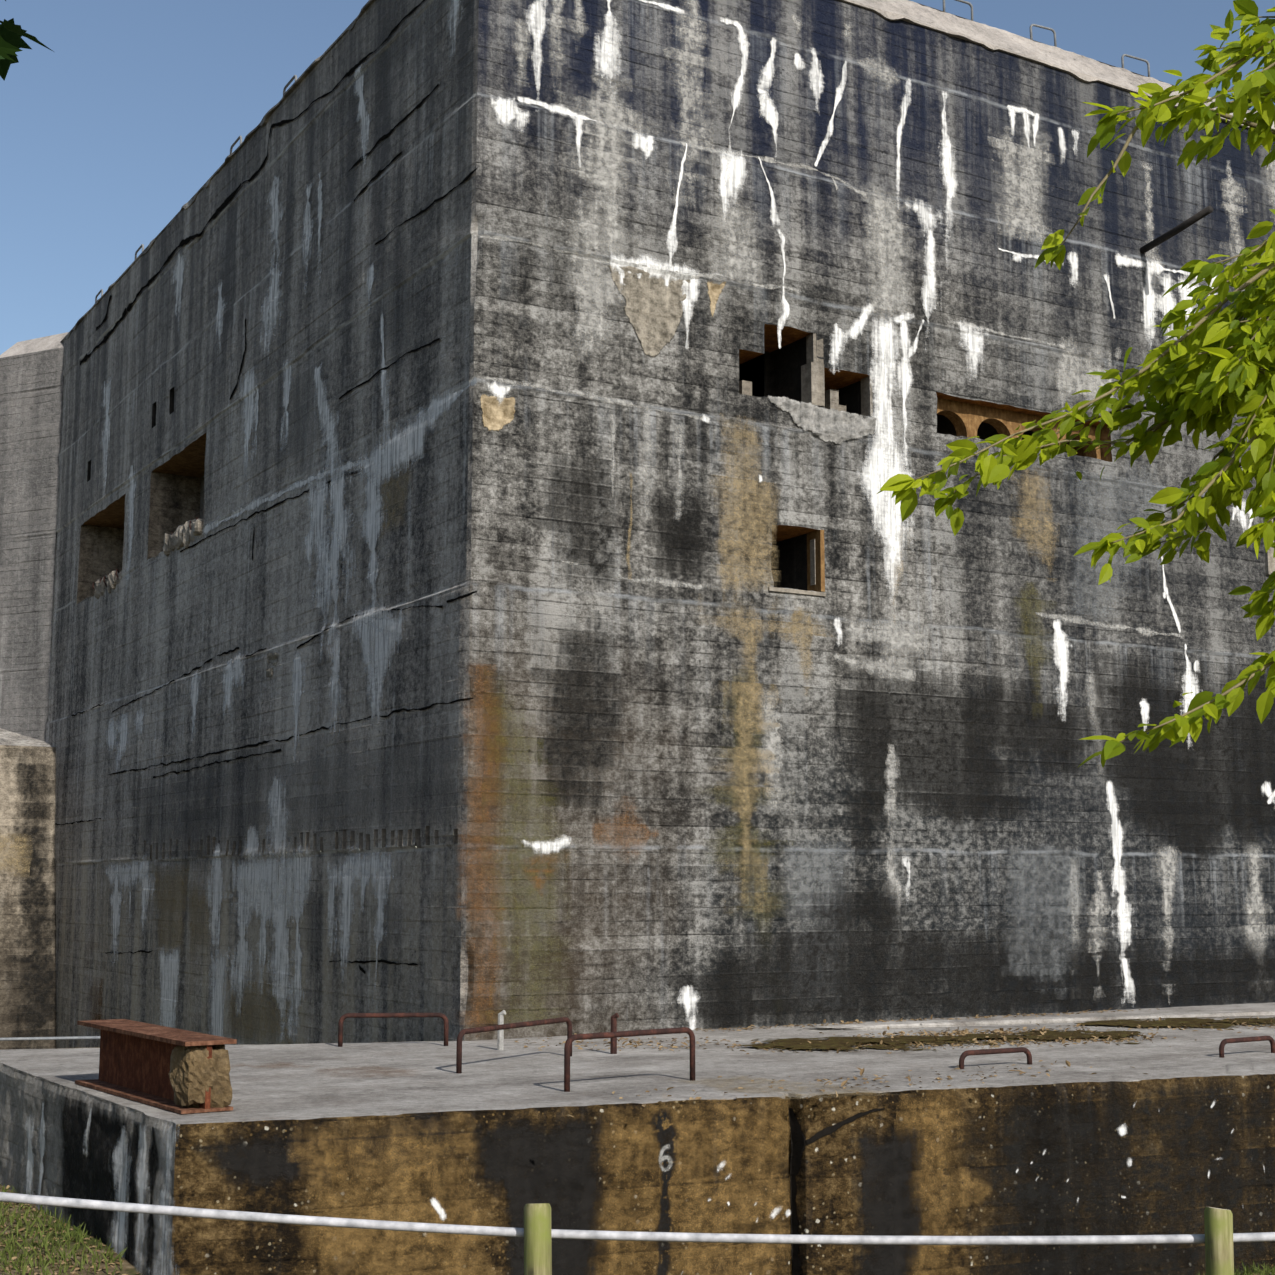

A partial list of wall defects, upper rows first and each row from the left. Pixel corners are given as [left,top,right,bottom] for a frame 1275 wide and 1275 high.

crack [80,0,425,365]
crack [348,84,439,201]
leakage [572,0,699,353]
leakage [758,38,778,141]
crack [229,319,246,400]
spalling [480,382,515,431]
spalling [609,265,726,357]
leakage [832,60,957,588]
crack [108,698,474,778]
leakage [679,584,1275,1030]
leakage [196,1079,883,1275]
leakage [853,1075,1275,1275]